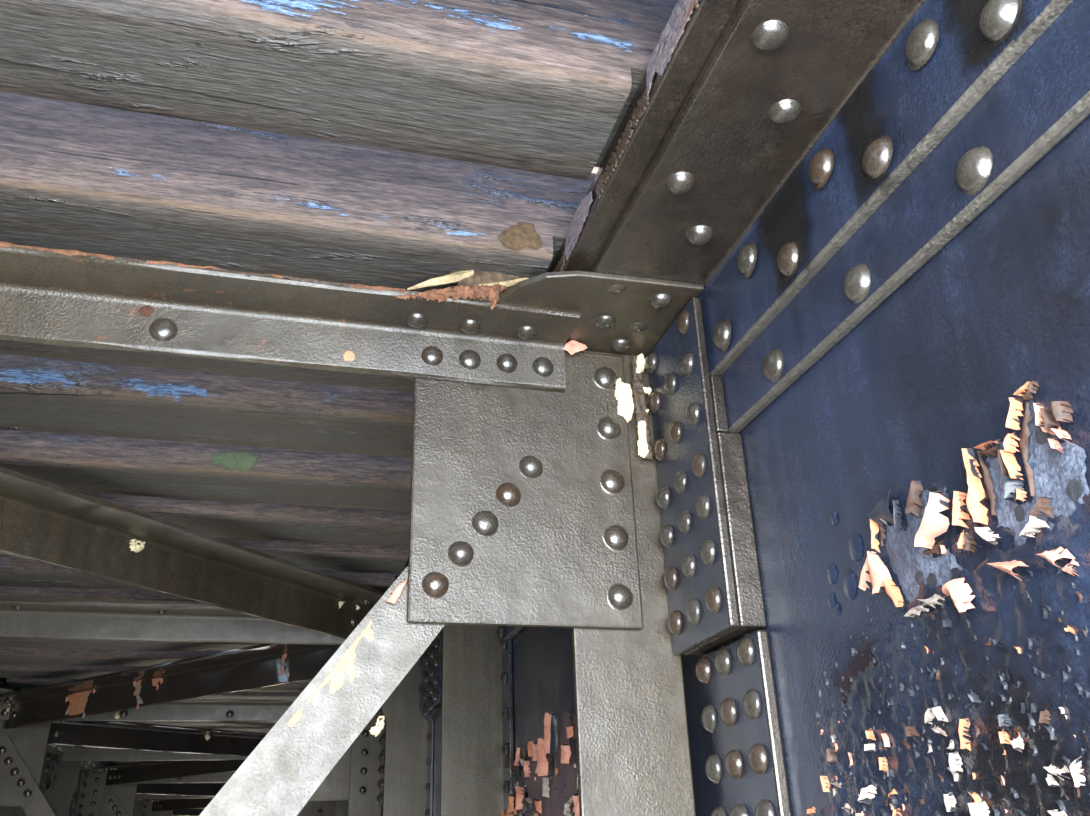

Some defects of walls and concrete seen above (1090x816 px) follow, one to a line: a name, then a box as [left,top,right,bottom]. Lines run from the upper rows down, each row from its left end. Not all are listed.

corrosion [0,241,509,310]
corrosion [139,306,154,316]
peeling [386,579,407,604]
peeling [814,381,1090,816]
peeling [65,689,96,719]
peeling [133,678,163,710]
peeling [286,620,375,727]
peeling [501,711,580,816]